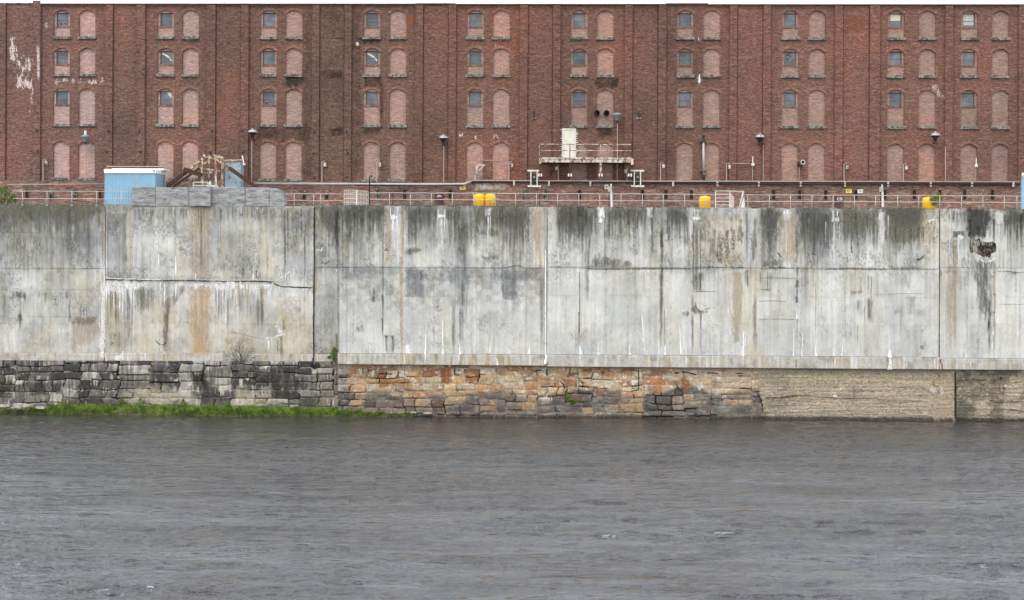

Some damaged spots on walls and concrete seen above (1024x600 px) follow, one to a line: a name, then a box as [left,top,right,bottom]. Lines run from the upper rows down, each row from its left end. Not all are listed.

peeling [9,37,40,112]
damp [99,256,271,358]
damp [335,207,529,251]
damp [782,210,918,273]
spalling [953,232,996,258]
damp [949,212,1023,350]